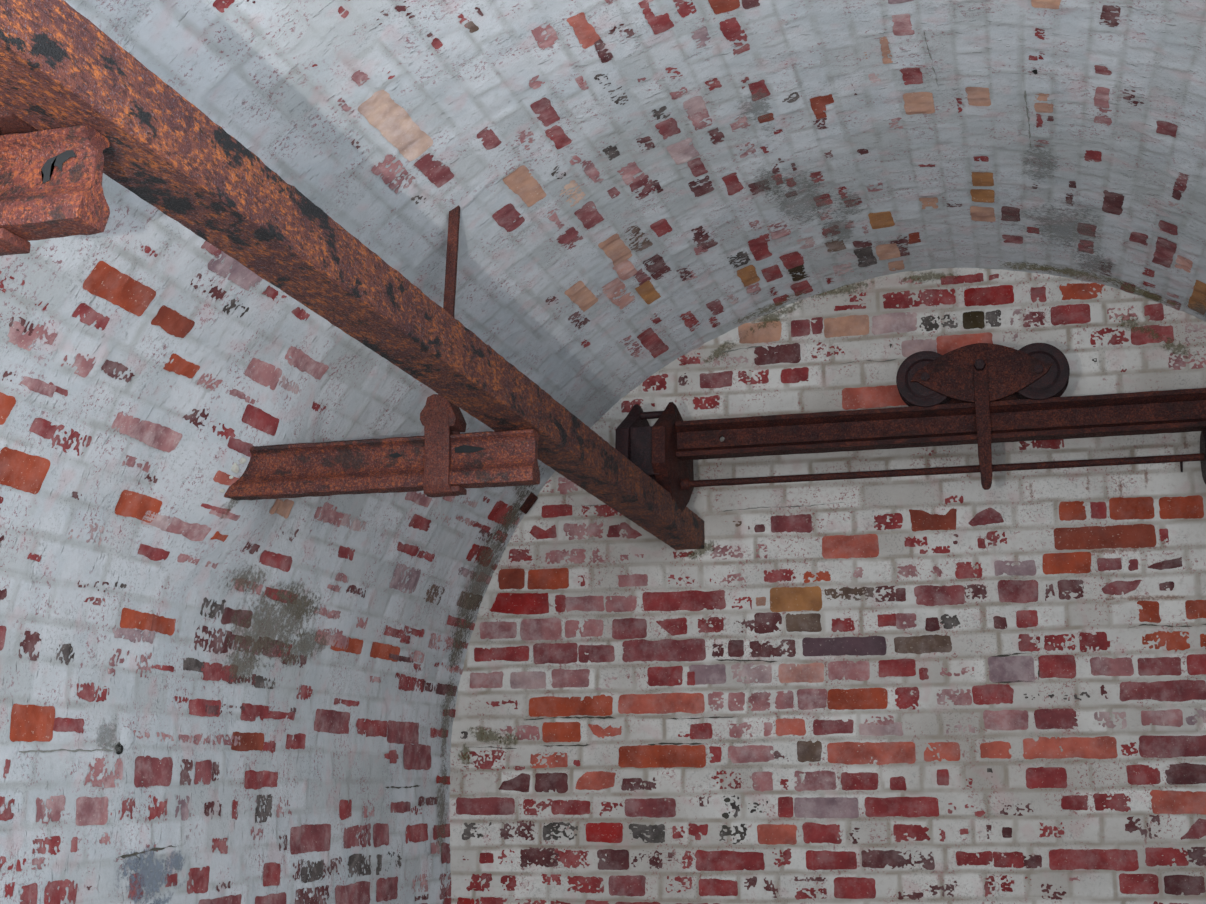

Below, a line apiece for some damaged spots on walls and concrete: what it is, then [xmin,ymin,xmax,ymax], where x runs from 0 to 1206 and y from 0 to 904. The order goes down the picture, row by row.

peeling [567,0,635,105]
peeling [638,0,760,55]
peeling [337,70,454,204]
peeling [492,65,1206,413]
peeling [72,261,195,338]
peeling [0,371,68,425]
peeling [0,418,92,509]
peeling [111,353,279,569]
leakage [227,566,265,591]
leakage [282,591,326,665]
peeling [10,704,84,742]
peeling [0,755,220,904]